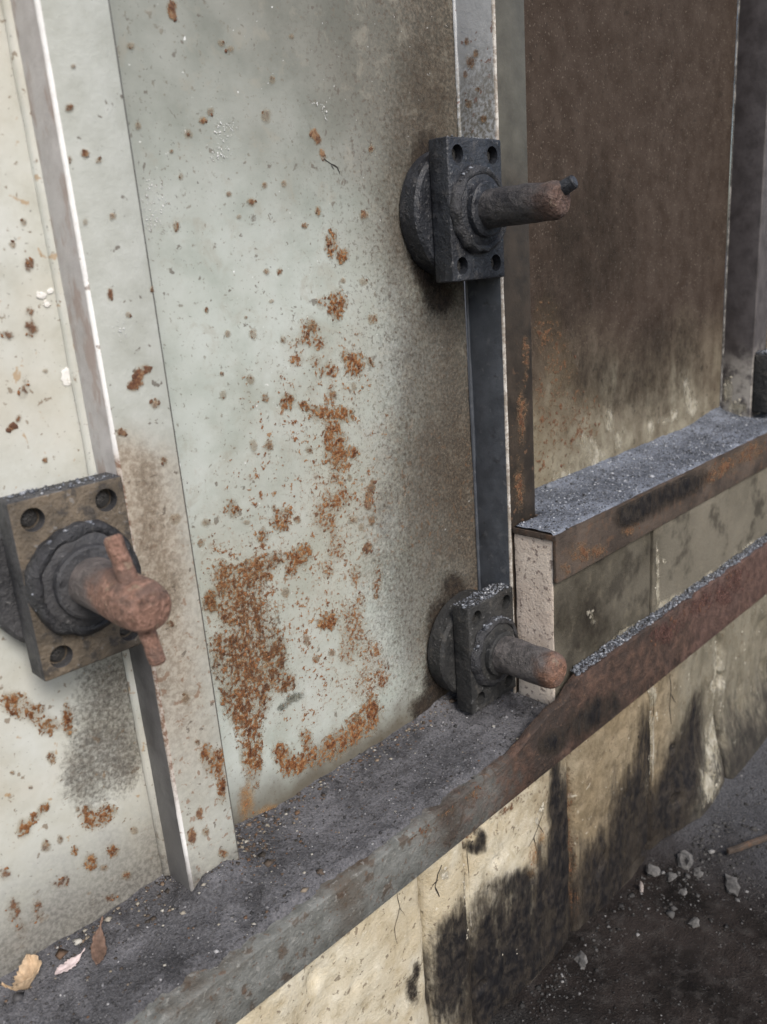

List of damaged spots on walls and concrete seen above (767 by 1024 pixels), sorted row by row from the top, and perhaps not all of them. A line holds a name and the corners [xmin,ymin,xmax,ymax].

corrosion [309,128,326,161]
corrosion [324,228,348,264]
corrosion [1,309,37,340]
corrosion [127,365,153,391]
corrosion [192,280,393,814]
corrosion [0,692,74,737]
leakage [646,687,657,782]
leakage [700,641,725,801]
corrosion [15,802,50,837]
corrosion [76,802,119,830]
corrosion [42,836,119,871]
corrosion [5,897,22,930]